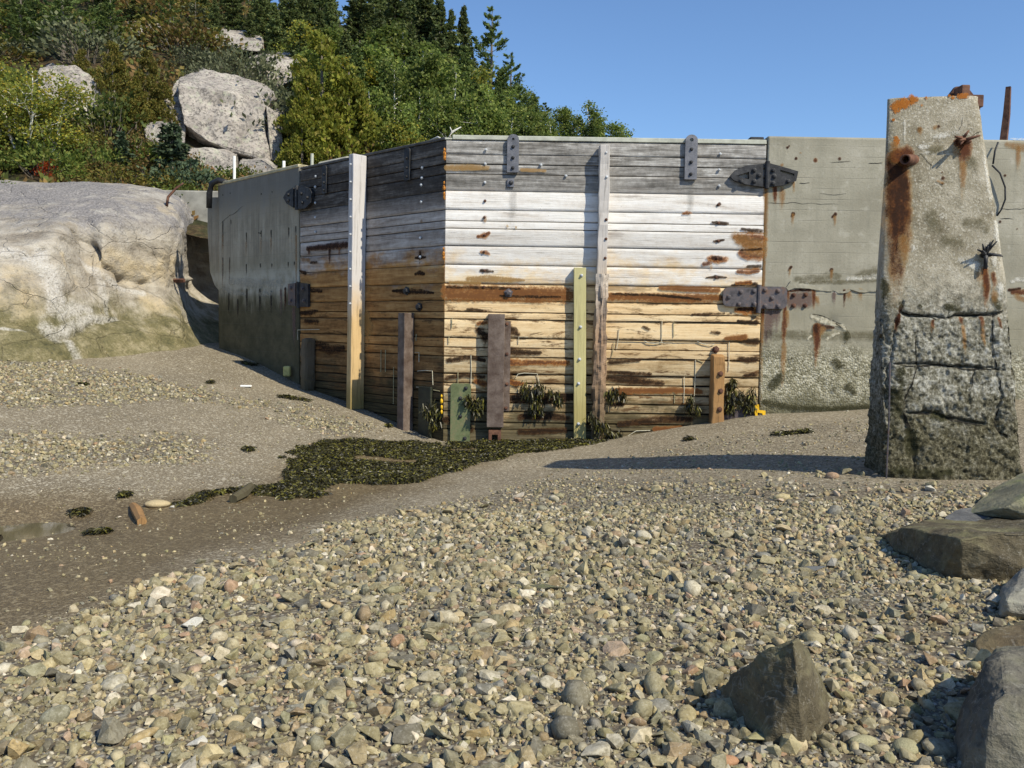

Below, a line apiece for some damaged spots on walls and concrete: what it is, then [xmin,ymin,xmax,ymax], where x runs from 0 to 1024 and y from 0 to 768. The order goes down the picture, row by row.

rust [954,139,973,181]
rust [702,182,795,287]
rust [885,146,914,274]
rust [734,289,819,371]
rust [813,323,834,366]
crack [890,302,1008,468]
rust [979,268,1024,343]